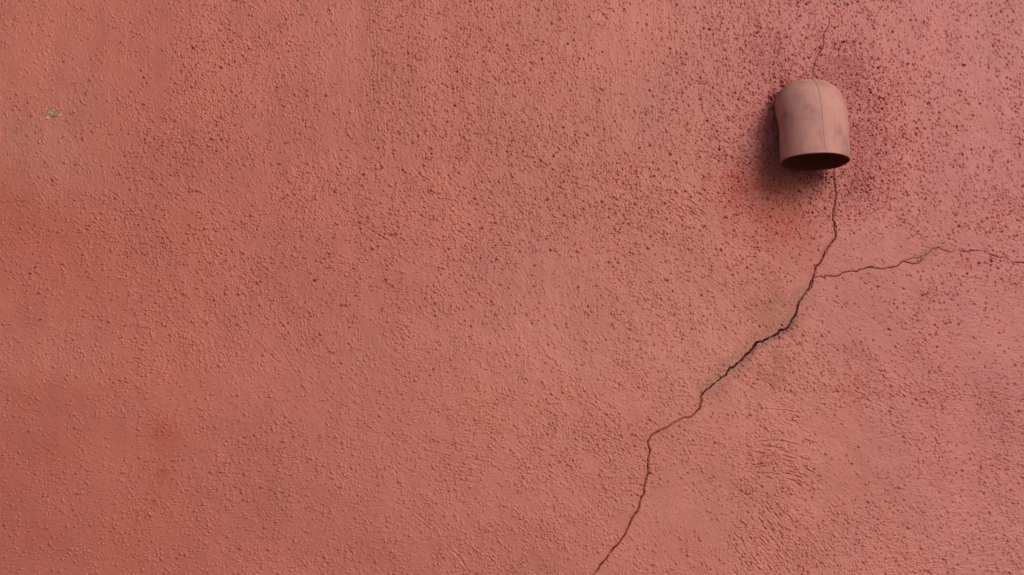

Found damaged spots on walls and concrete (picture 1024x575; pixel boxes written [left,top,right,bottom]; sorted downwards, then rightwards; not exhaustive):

crack [593,174,1024,575]